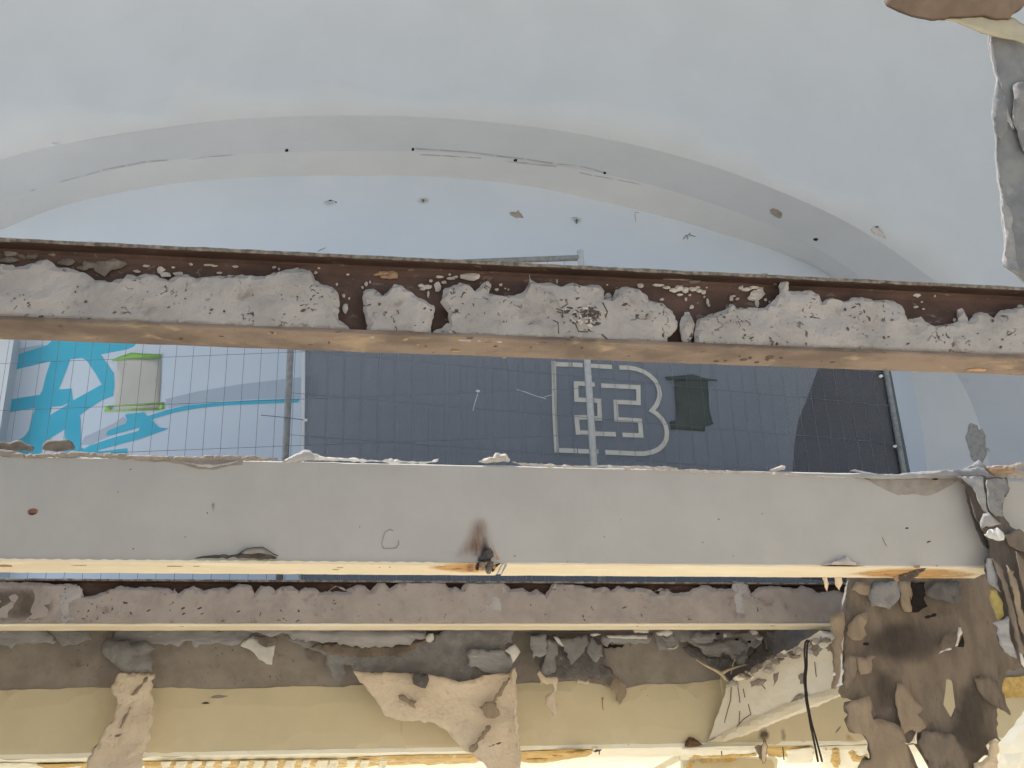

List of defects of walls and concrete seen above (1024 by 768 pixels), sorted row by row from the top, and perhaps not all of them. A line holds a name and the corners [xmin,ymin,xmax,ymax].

peeling [82,261,112,277]
peeling [133,263,239,300]
peeling [361,271,393,289]
peeling [414,273,458,326]
peeling [637,280,710,309]
peeling [729,284,777,308]
spalling [548,306,601,326]
rust [437,527,498,572]
peeling [240,635,278,665]
peeling [505,643,520,662]
peeling [1002,676,1024,699]